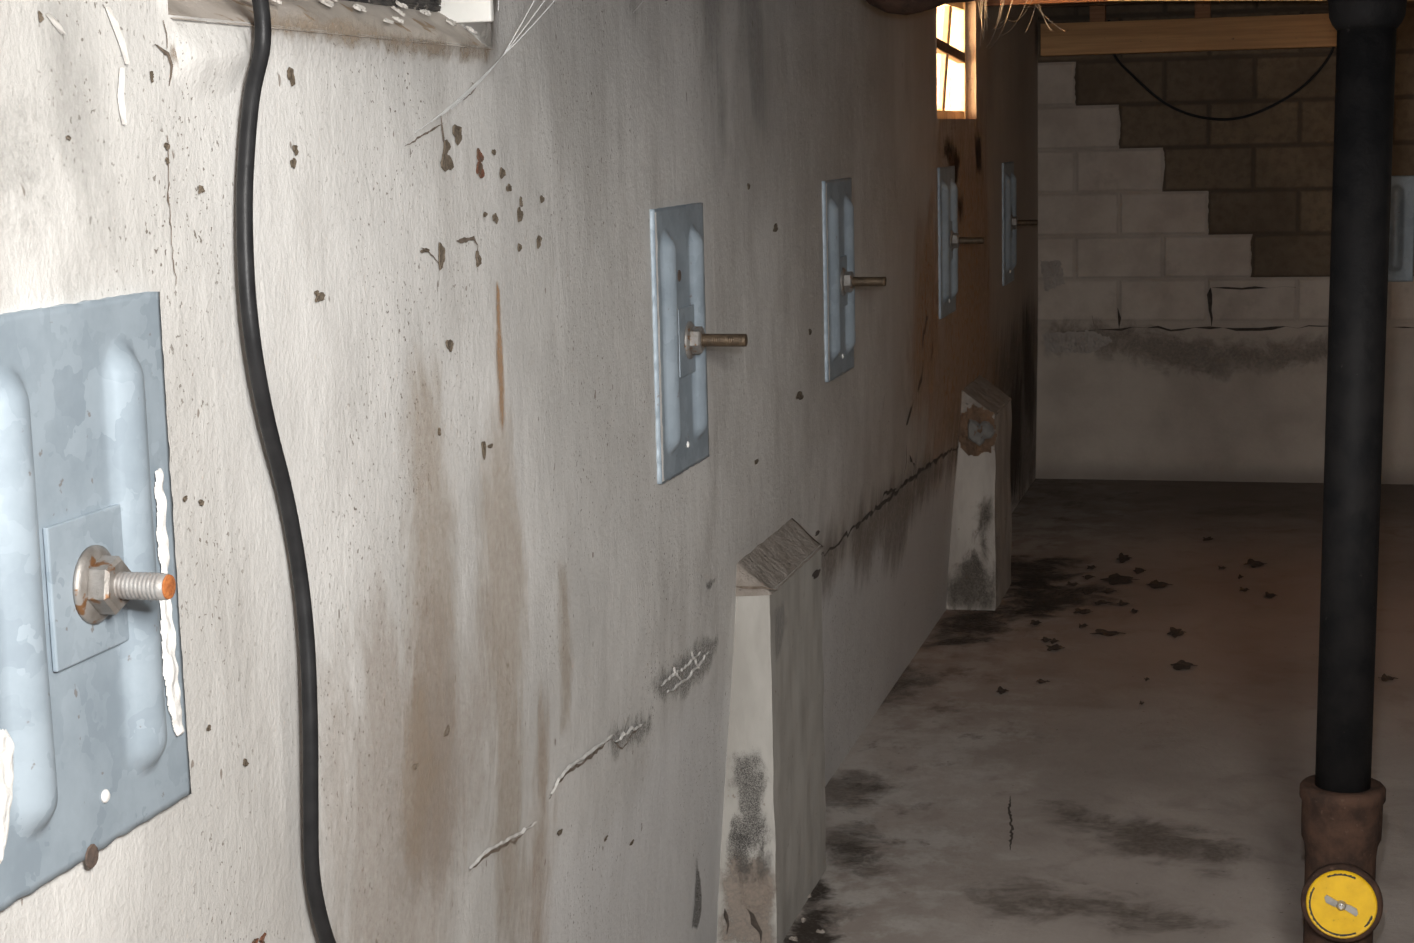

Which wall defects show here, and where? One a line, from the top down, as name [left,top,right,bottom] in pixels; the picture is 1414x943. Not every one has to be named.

crack [1077,286,1326,332]
crack [821,315,959,556]
damp [934,504,1101,645]
crack [469,728,639,872]
damp [729,756,767,878]